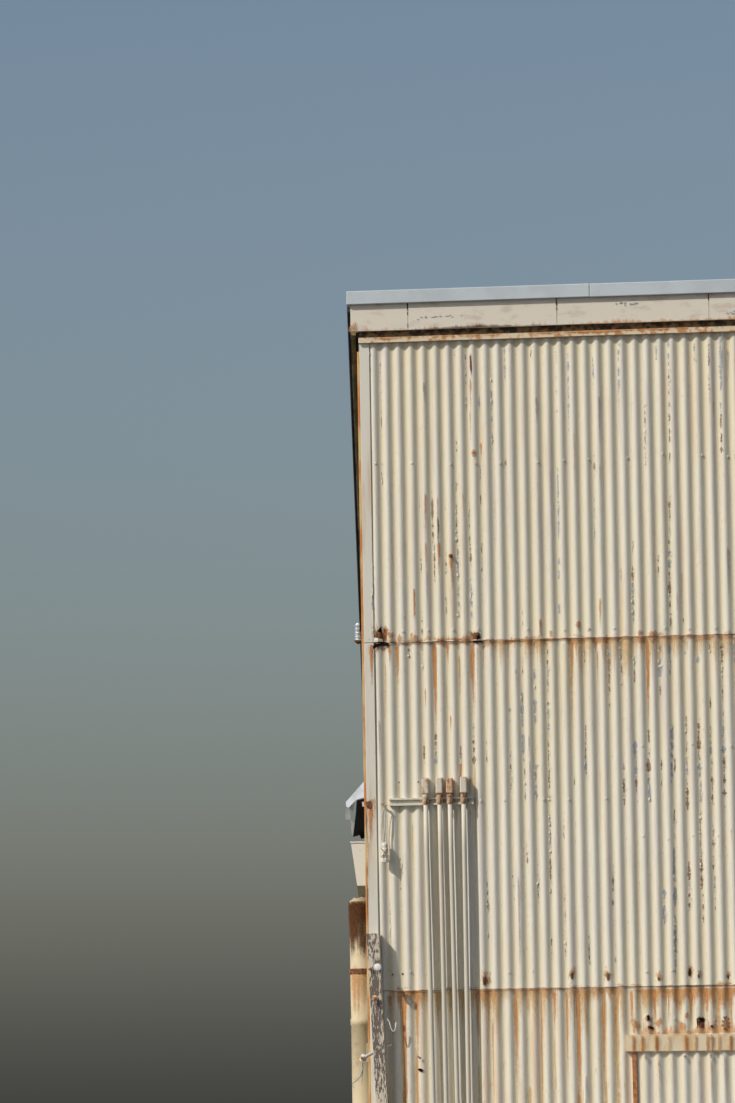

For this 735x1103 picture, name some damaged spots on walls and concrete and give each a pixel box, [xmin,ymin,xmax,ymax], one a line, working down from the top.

rust [350,317,735,339]
rust [370,621,735,711]
rust [348,868,368,954]
rust [352,974,366,1005]
rust [386,966,735,1103]